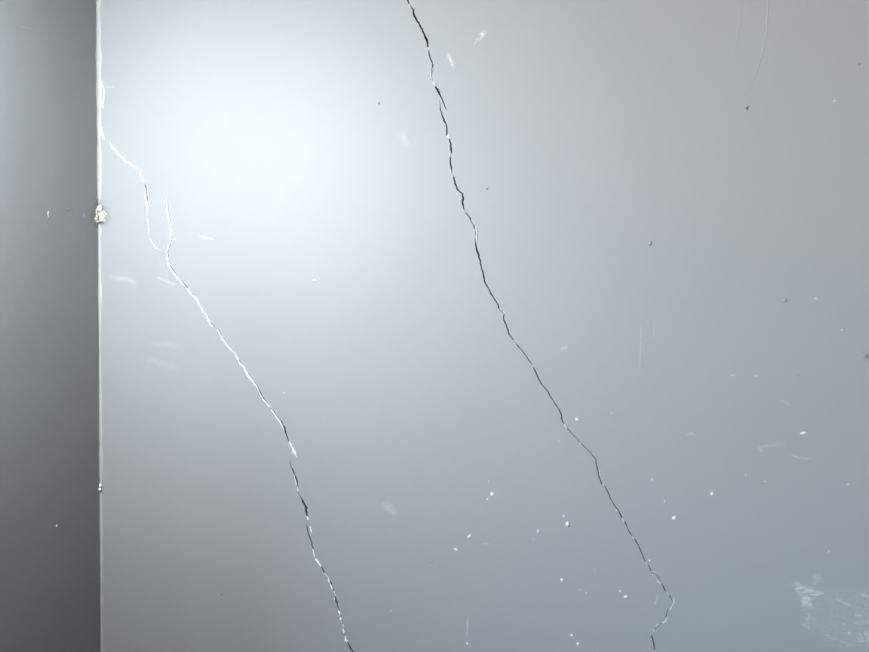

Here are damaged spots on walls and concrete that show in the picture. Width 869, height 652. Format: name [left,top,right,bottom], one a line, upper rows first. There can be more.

crack [100,78,353,652]
crack [407,0,675,652]